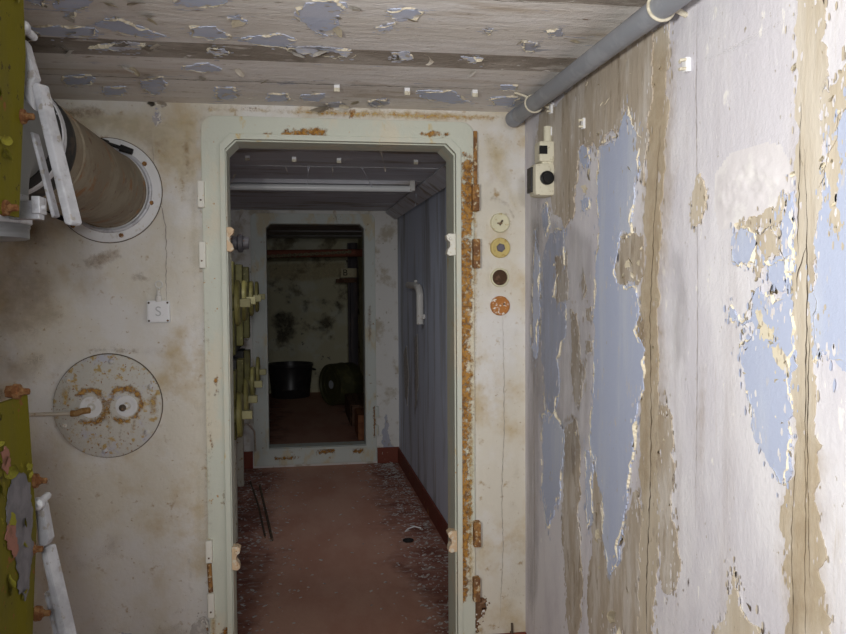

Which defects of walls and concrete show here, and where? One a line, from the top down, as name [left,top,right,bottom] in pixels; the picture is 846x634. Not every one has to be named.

peeling [18,0,170,58]
peeling [181,0,361,80]
peeling [373,6,426,33]
peeling [459,55,484,77]
peeling [516,26,580,53]
corrosion [281,128,327,136]
peeling [265,93,390,112]
spalling [688,173,708,232]
peeling [530,21,681,634]
spalling [723,0,846,634]
corrosion [456,152,490,633]
spalling [711,549,769,634]